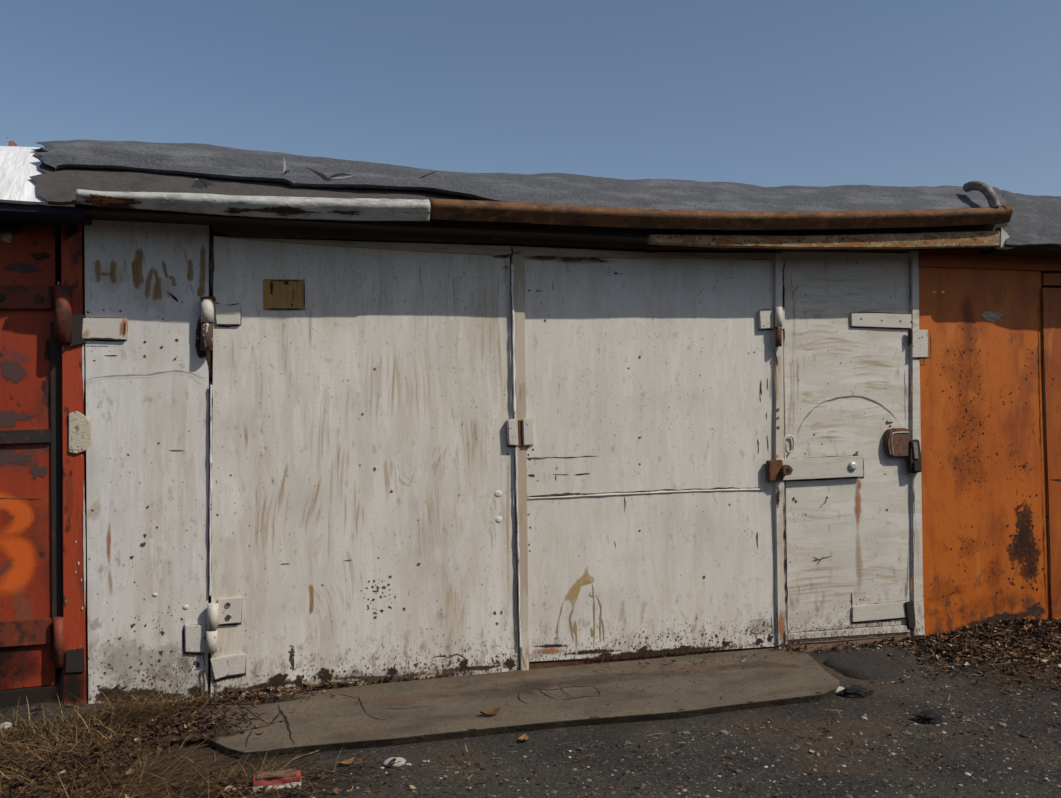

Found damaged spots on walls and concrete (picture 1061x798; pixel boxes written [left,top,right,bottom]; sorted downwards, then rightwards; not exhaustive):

rust [936,320,1048,605]
rust [535,607,786,662]
rust [217,648,525,701]